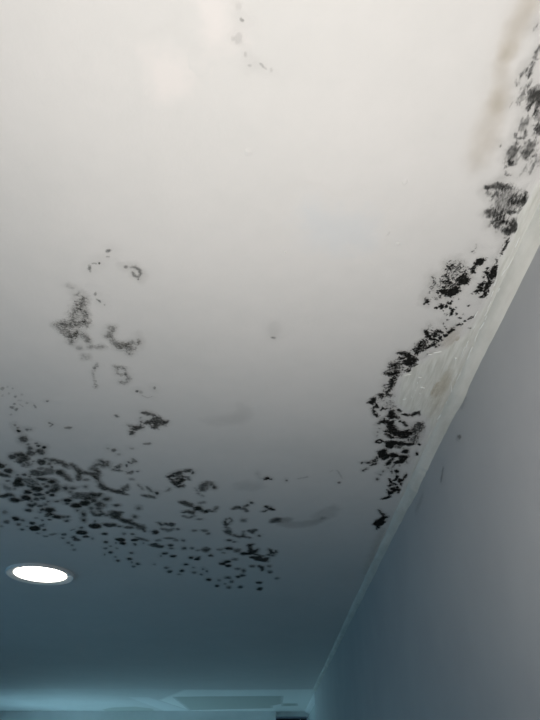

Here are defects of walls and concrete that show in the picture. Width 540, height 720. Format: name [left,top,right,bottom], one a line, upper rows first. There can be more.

mould [526,88,540,114]
mould [506,122,540,167]
mould [361,182,528,500]
mould [129,412,168,435]
mould [0,430,139,543]
mould [167,469,194,488]
mould [373,509,388,530]
mould [225,527,277,589]